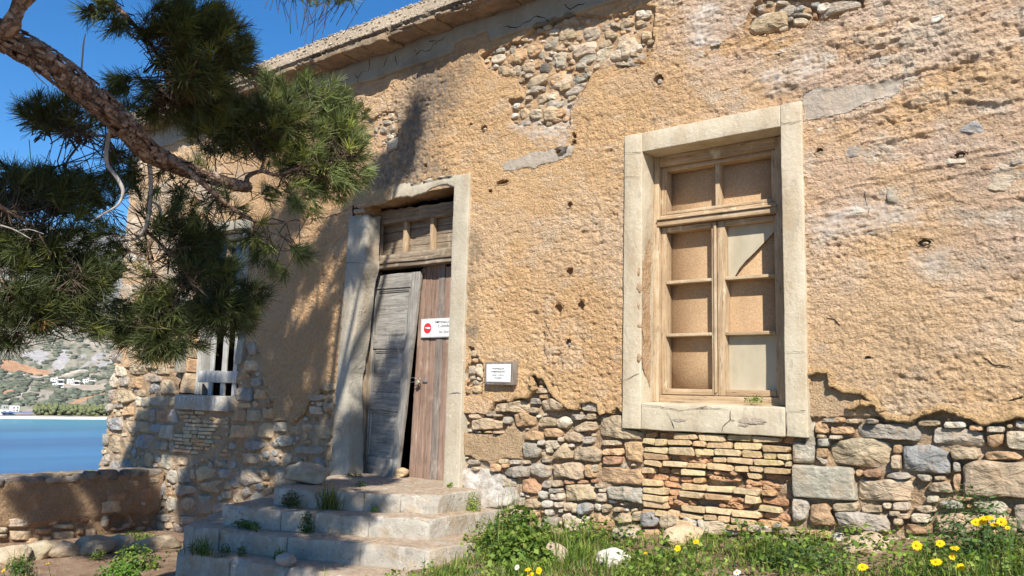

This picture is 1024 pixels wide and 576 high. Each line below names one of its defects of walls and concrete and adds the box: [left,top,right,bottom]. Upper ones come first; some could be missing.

crack [504,2,586,28]
peeling [743,0,865,36]
peeling [480,4,656,128]
flaking render [507,371,605,415]
crack [646,405,734,429]
flaking render [807,368,1024,426]
spalling [668,495,698,507]
spalling [679,455,782,510]